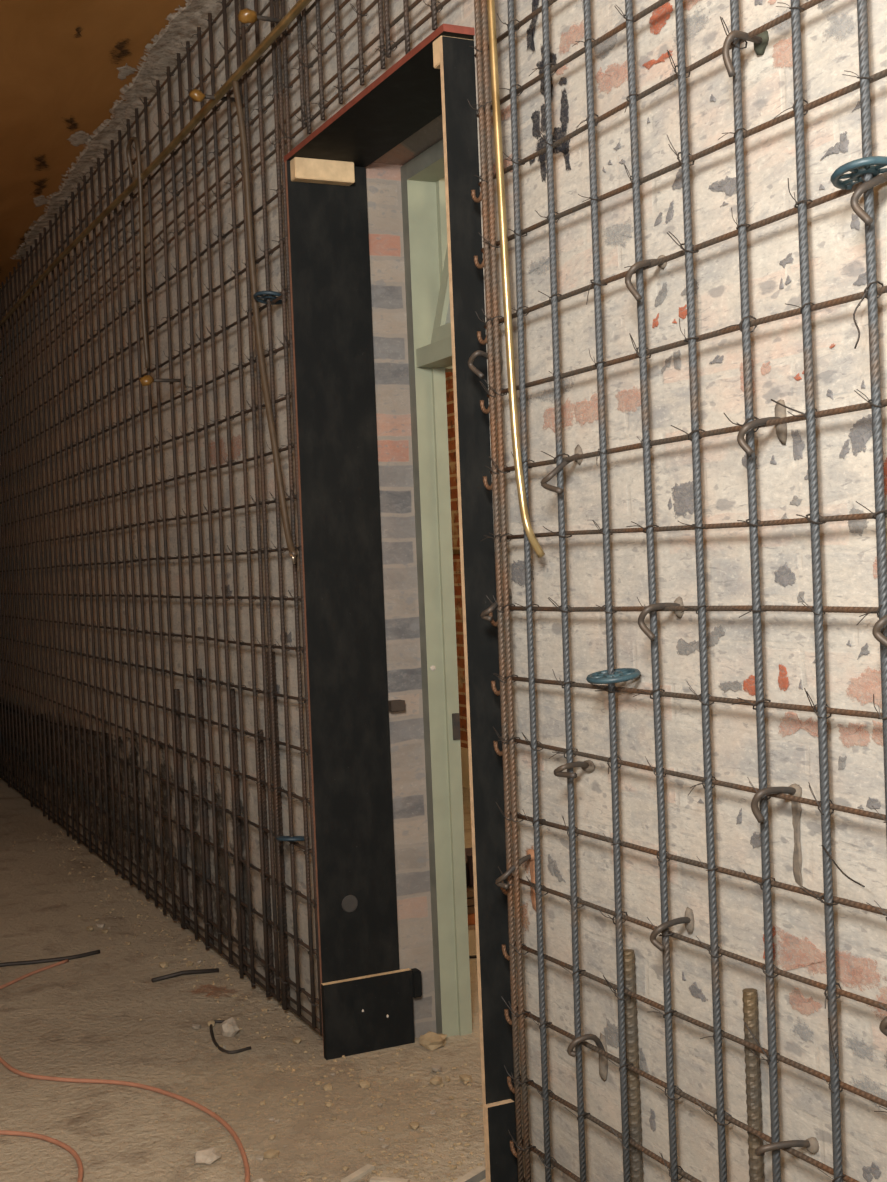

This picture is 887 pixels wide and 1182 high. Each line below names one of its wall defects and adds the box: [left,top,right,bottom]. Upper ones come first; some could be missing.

spalling [0,0,451,1040]
water stain [529,154,547,183]
water stain [526,0,571,170]
spalling [467,0,887,1182]